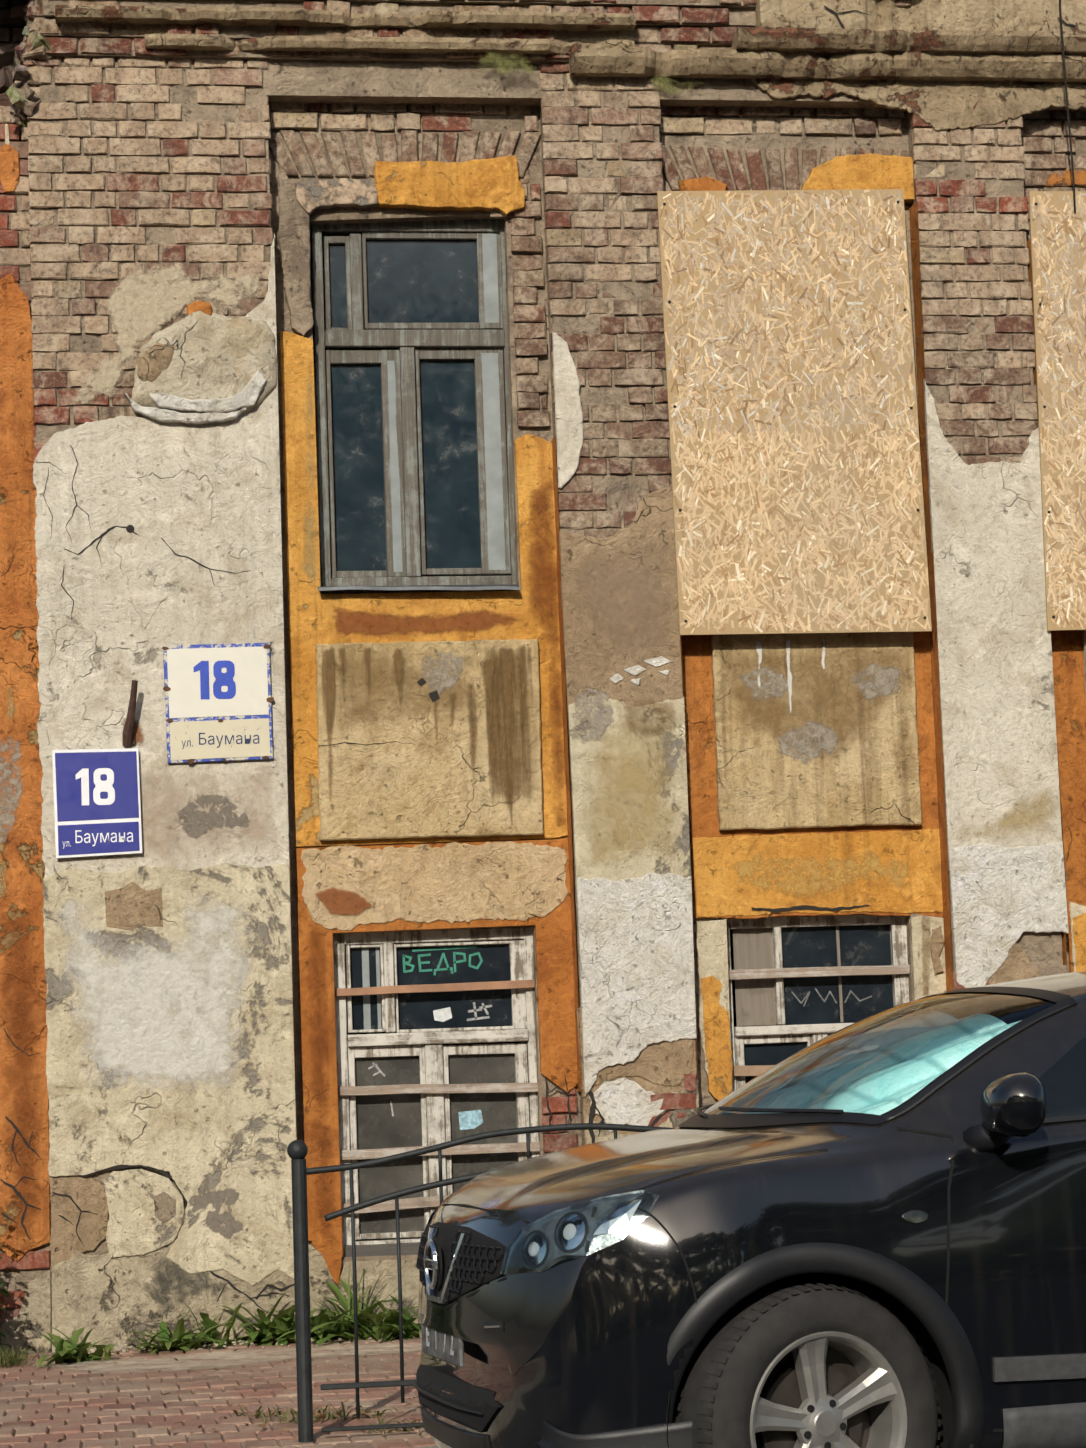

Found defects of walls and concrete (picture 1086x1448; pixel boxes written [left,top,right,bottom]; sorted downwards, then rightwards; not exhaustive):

flaking render [0,56,1086,539]
crack [43,445,251,620]
damp [532,489,556,623]
corrosion [125,719,142,742]
damp [322,609,515,736]
damp [426,647,531,803]
damp [734,639,899,763]
peeling [923,926,965,994]
flaking render [986,943,1067,985]
flaking render [542,1038,705,1155]
crack [210,1271,294,1313]